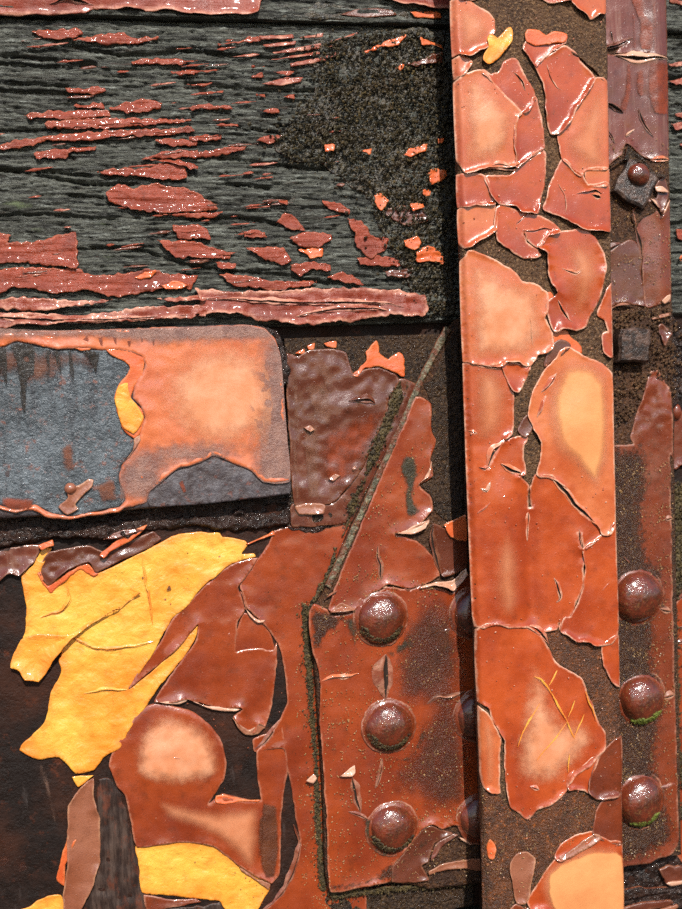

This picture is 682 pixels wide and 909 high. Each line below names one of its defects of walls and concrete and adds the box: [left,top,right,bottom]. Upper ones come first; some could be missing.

peeling [22,27,159,48]
crack [514,72,525,90]
corrosion [621,63,668,114]
crack [480,150,539,171]
crack [558,184,602,212]
crack [516,213,552,233]
spalling [0,32,429,516]
crack [562,267,581,275]
crack [558,300,573,322]
corrosion [326,416,379,483]
peeling [277,0,672,909]
peeling [0,531,288,909]